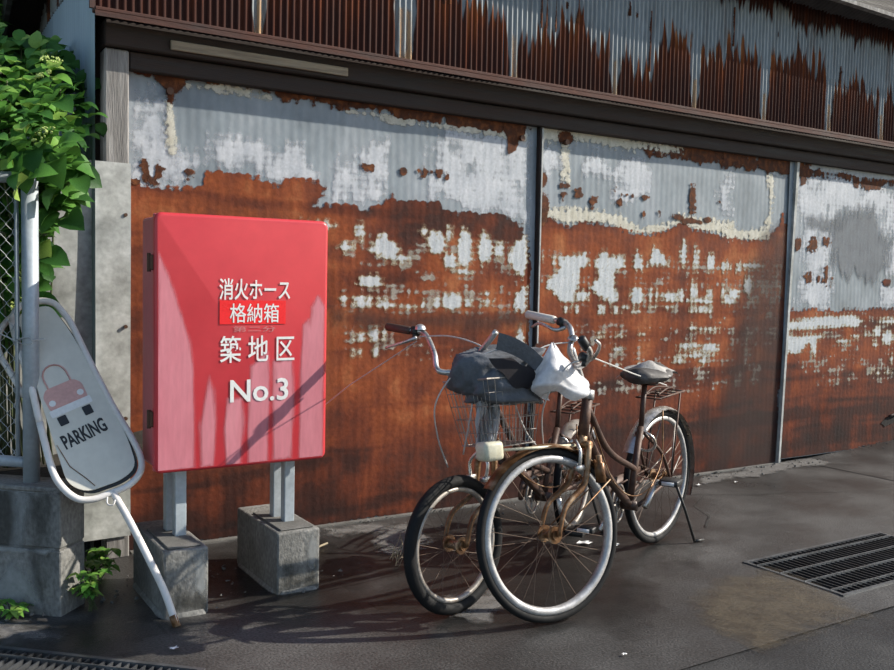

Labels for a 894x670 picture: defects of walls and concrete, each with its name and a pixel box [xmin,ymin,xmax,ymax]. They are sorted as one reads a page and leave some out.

peeling [132,99,319,190]
rust [262,90,532,154]
peeling [345,109,531,223]
rust [95,0,894,154]
peeling [547,173,775,243]
peeling [421,224,530,314]
rust [130,158,894,525]
peeling [542,238,761,367]
peeling [787,173,894,375]
water stain [0,491,49,552]
rust [186,463,270,540]
water stain [0,565,37,602]